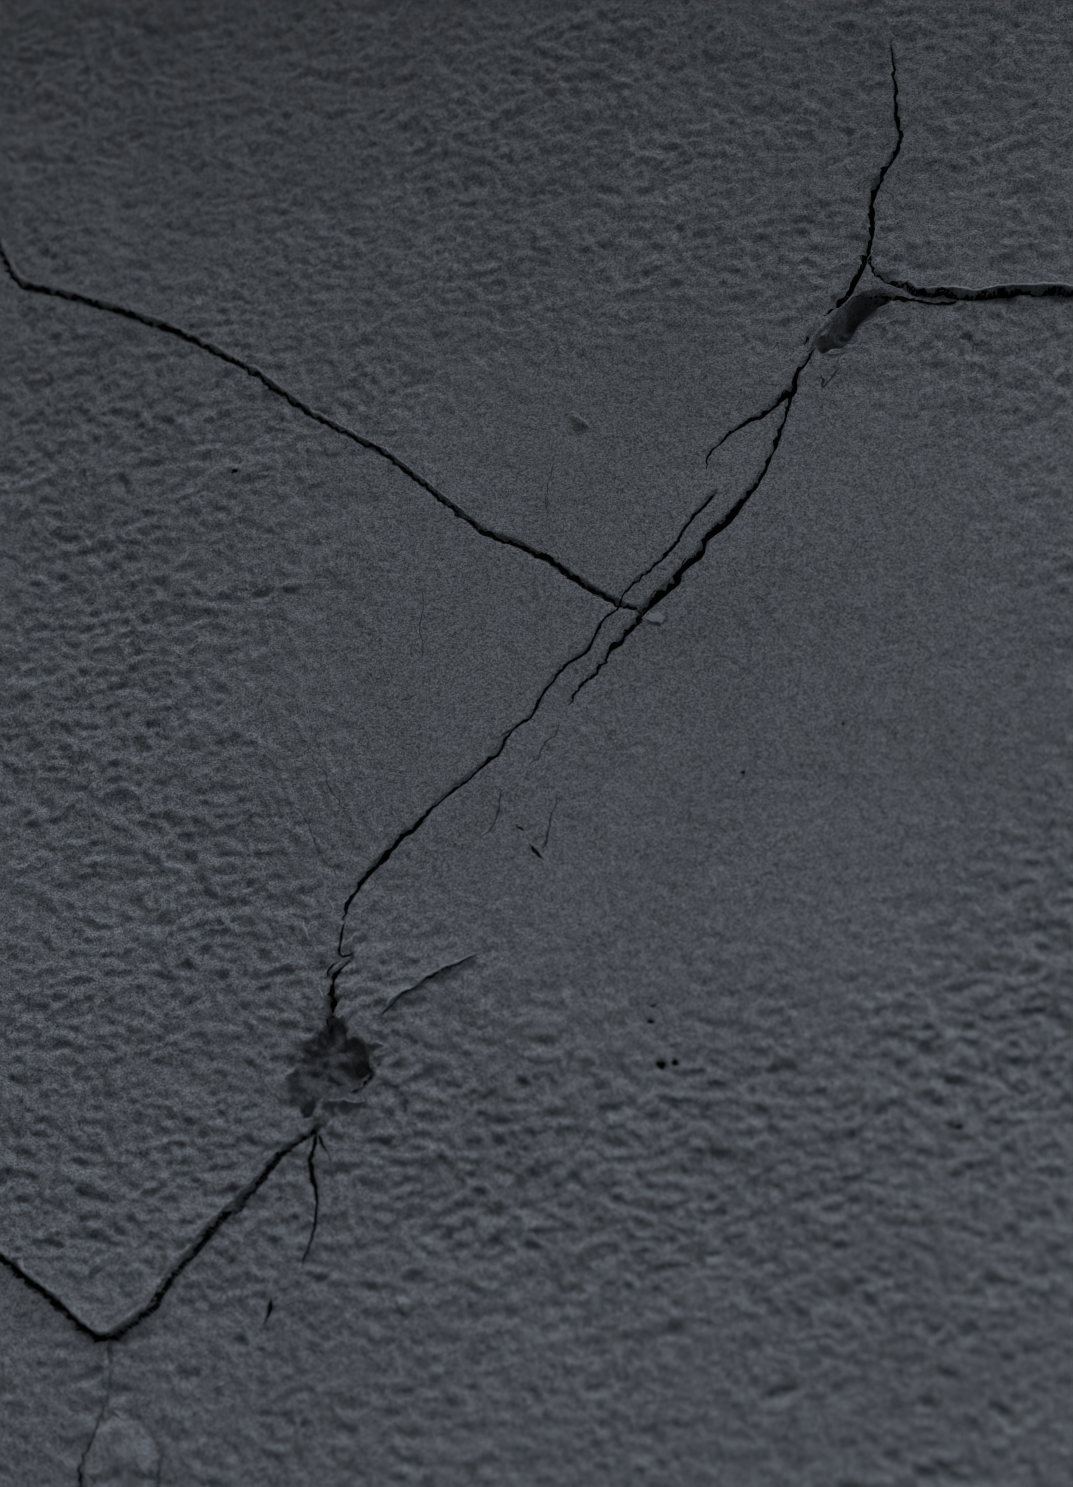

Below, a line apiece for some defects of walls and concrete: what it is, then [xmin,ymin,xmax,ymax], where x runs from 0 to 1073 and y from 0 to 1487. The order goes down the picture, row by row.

crack [0,44,1073,1034]
crack [0,1126,332,1344]